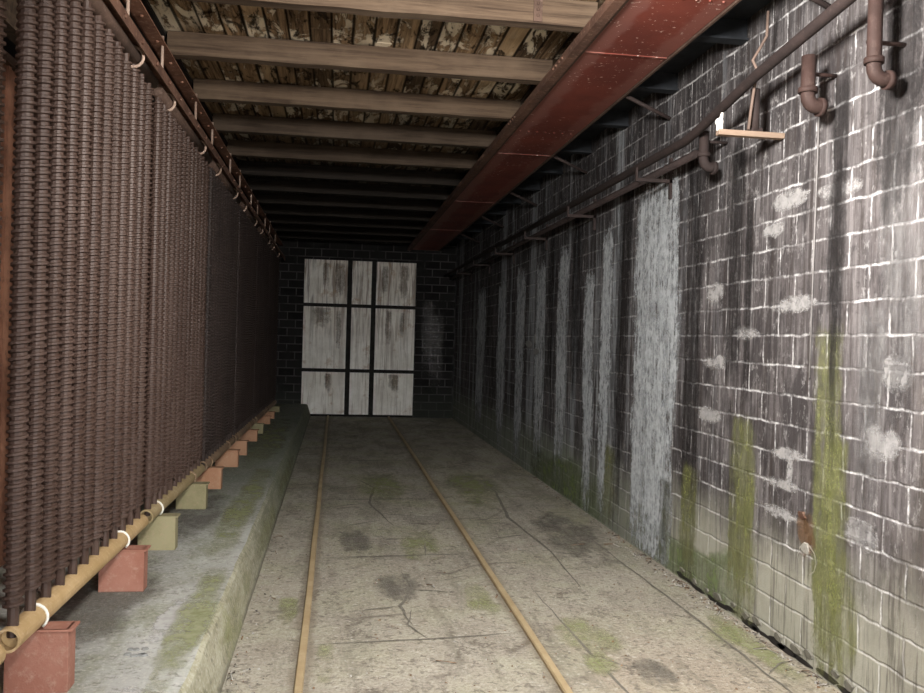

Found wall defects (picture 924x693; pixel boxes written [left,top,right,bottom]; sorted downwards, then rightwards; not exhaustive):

damp [475,290,486,421]
damp [496,146,755,564]
crack [472,475,793,693]
damp [728,423,802,600]
damp [764,77,875,675]
efflorescence [865,428,900,459]
efflorescence [882,358,911,388]